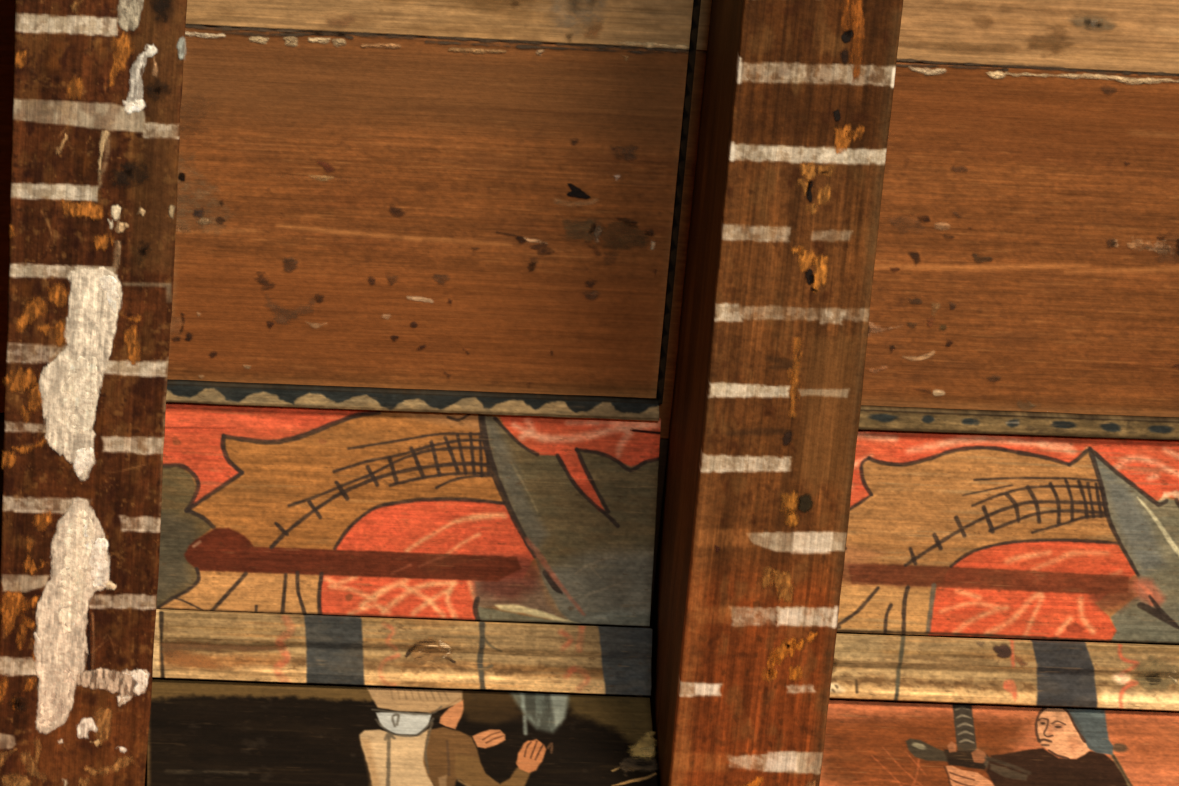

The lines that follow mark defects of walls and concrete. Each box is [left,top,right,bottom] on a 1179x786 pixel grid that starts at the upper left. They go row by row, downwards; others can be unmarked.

peeling [147,45,157,75]
peeling [124,99,145,113]
peeling [99,275,119,314]
peeling [62,356,99,434]
peeling [74,447,94,477]
peeling [59,510,116,633]
peeling [37,668,78,726]
peeling [117,670,148,703]